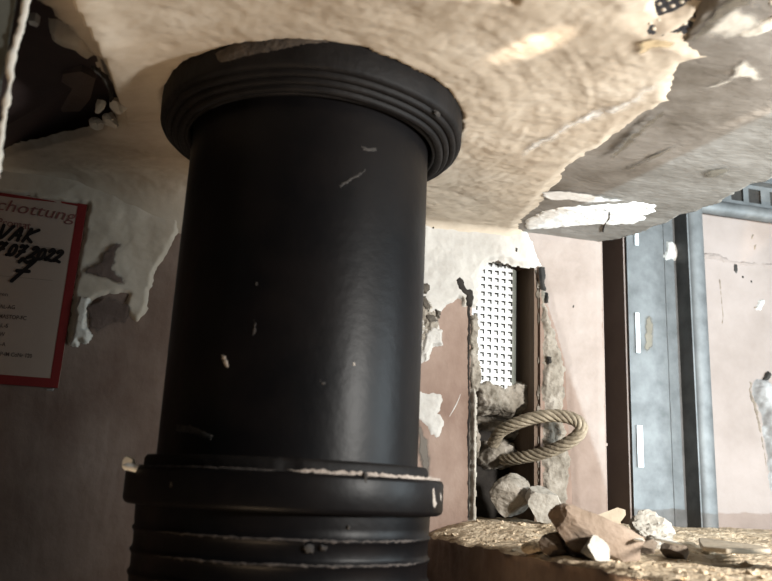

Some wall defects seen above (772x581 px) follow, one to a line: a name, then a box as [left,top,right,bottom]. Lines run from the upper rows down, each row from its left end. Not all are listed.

peeling [86,244,124,284]
peeling [69,296,129,347]
spalling [421,283,443,362]
spalling [457,277,482,391]
spalling [536,267,566,411]
spalling [537,451,571,503]